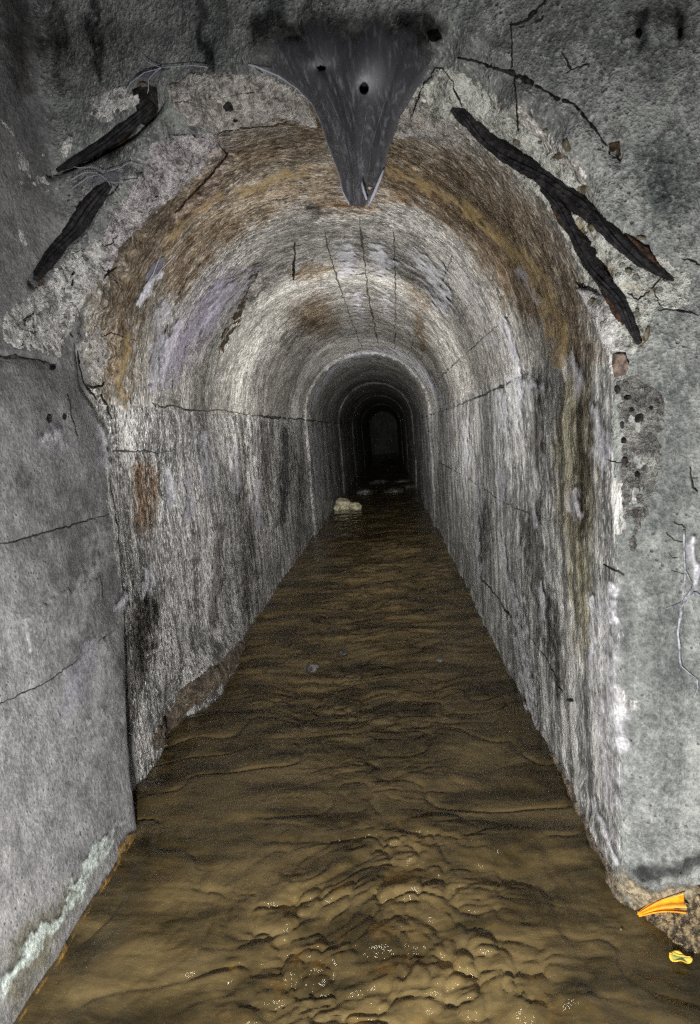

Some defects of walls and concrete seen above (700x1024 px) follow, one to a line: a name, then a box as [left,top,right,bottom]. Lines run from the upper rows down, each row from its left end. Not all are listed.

crack [410,0,621,162]
spalling [2,72,318,357]
leakage [136,271,164,306]
leakage [158,282,235,383]
leakage [310,347,446,412]
leakage [332,242,465,321]
leakage [491,315,543,434]
spalling [393,66,692,551]
leakage [572,352,582,396]
crack [666,521,686,574]
leakage [0,821,136,997]